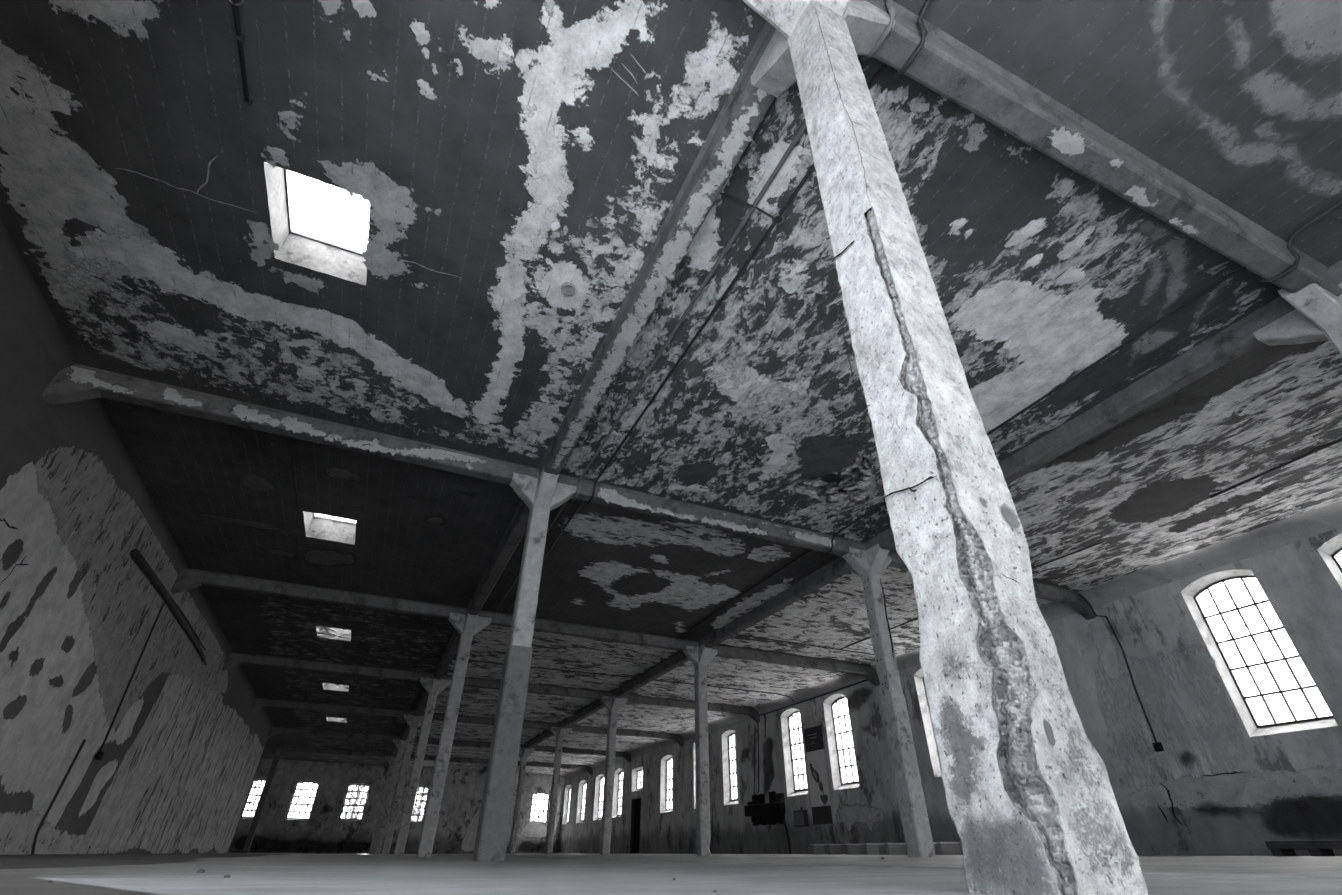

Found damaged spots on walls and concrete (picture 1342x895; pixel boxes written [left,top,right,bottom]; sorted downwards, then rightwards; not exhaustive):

peeling [0,445,264,855]
peeling [0,0,888,775]
spalling [865,207,1077,895]
peeling [861,66,1265,462]
peeling [1001,341,1342,591]